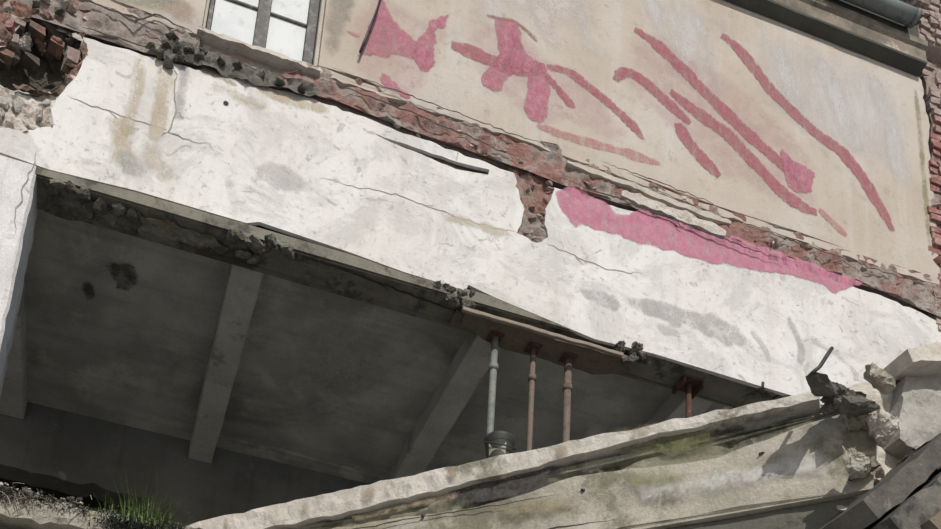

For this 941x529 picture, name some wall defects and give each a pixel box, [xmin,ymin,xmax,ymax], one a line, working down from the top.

spalling [0,0,88,132]
crack [69,70,207,143]
crack [324,68,556,161]
crack [14,150,38,233]
spalling [406,148,488,175]
spalling [508,166,553,243]
spalling [225,228,294,264]
spalling [848,382,893,415]
spalling [875,446,900,479]